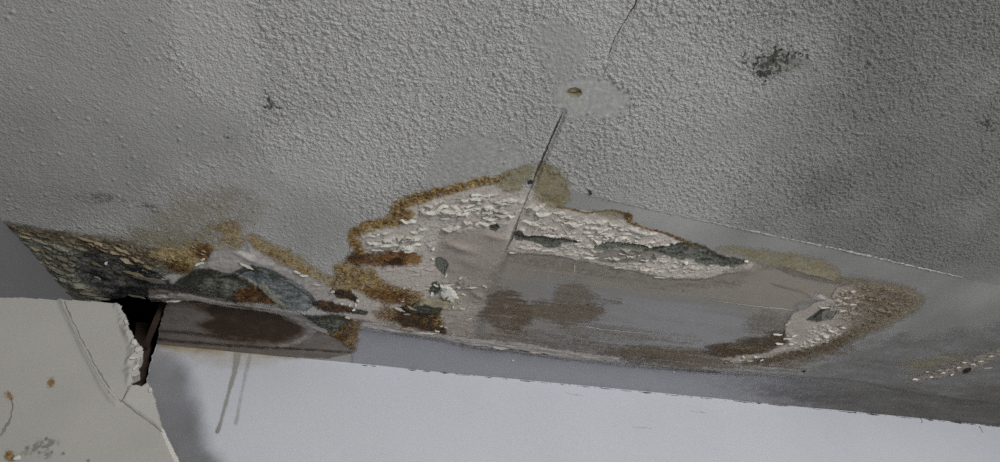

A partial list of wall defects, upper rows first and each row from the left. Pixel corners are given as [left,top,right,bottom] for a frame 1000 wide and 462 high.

mould [742,43,808,85]
crack [505,92,577,251]
water stain [8,163,701,462]
peeling [3,184,764,362]
water stain [476,246,924,373]
peeling [721,284,920,364]